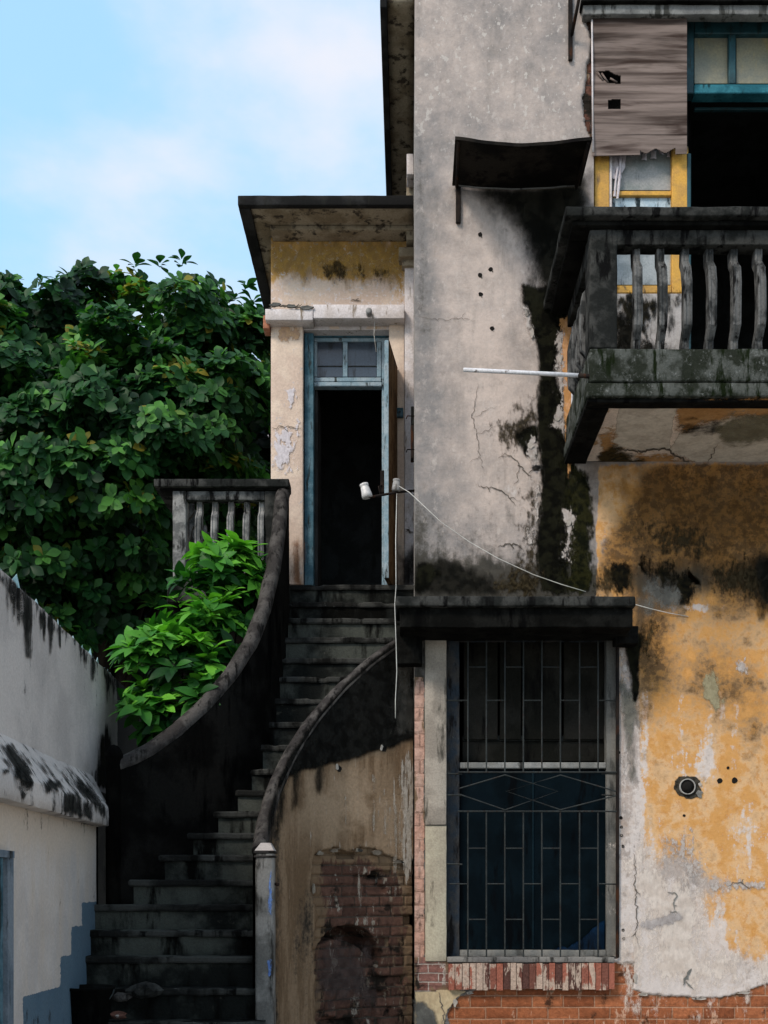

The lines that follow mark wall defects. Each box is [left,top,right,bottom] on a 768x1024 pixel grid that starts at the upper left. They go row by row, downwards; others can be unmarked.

damp [274,241,401,280]
damp [617,283,657,349]
peeling [271,387,300,474]
damp [398,272,572,597]
crack [471,388,535,506]
damp [597,446,644,462]
damp [0,571,61,658]
damp [712,553,768,618]
damp [1,725,112,821]
damp [268,643,414,833]
peeling [619,648,631,786]
flaking render [310,671,768,1024]